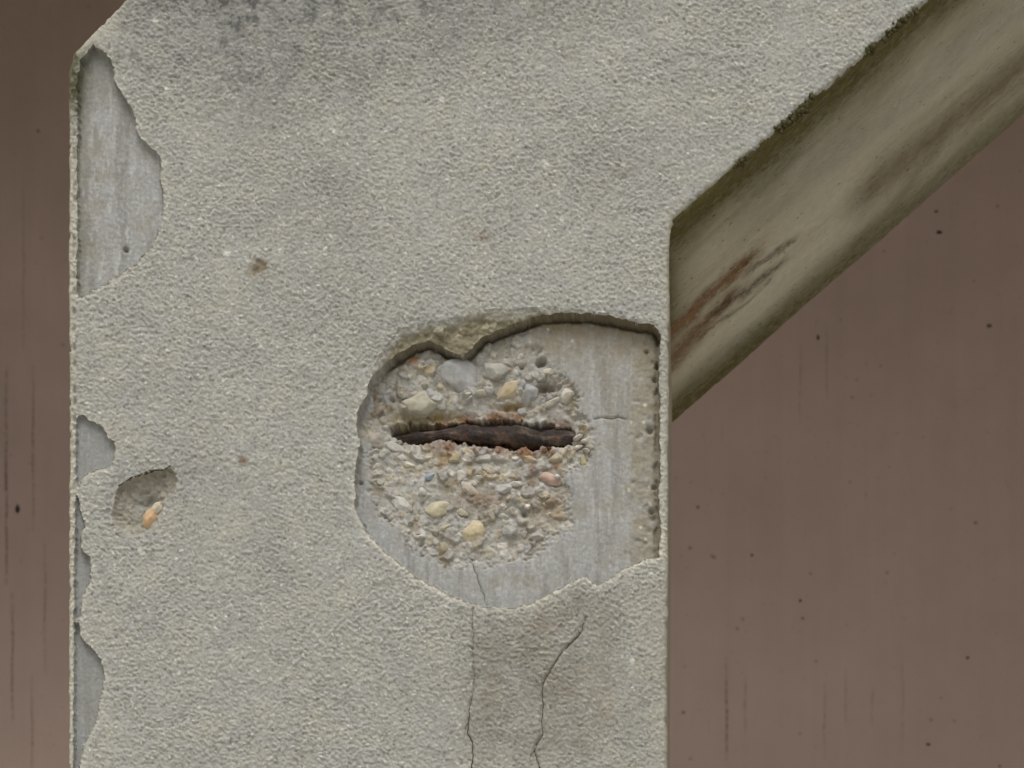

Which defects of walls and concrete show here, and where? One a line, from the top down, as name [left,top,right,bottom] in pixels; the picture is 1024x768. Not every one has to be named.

peeling [76,44,164,297]
rust [671,253,755,369]
peeling [72,414,116,768]
spalling [111,467,178,537]
spalling [354,306,661,608]
crack [530,620,586,768]